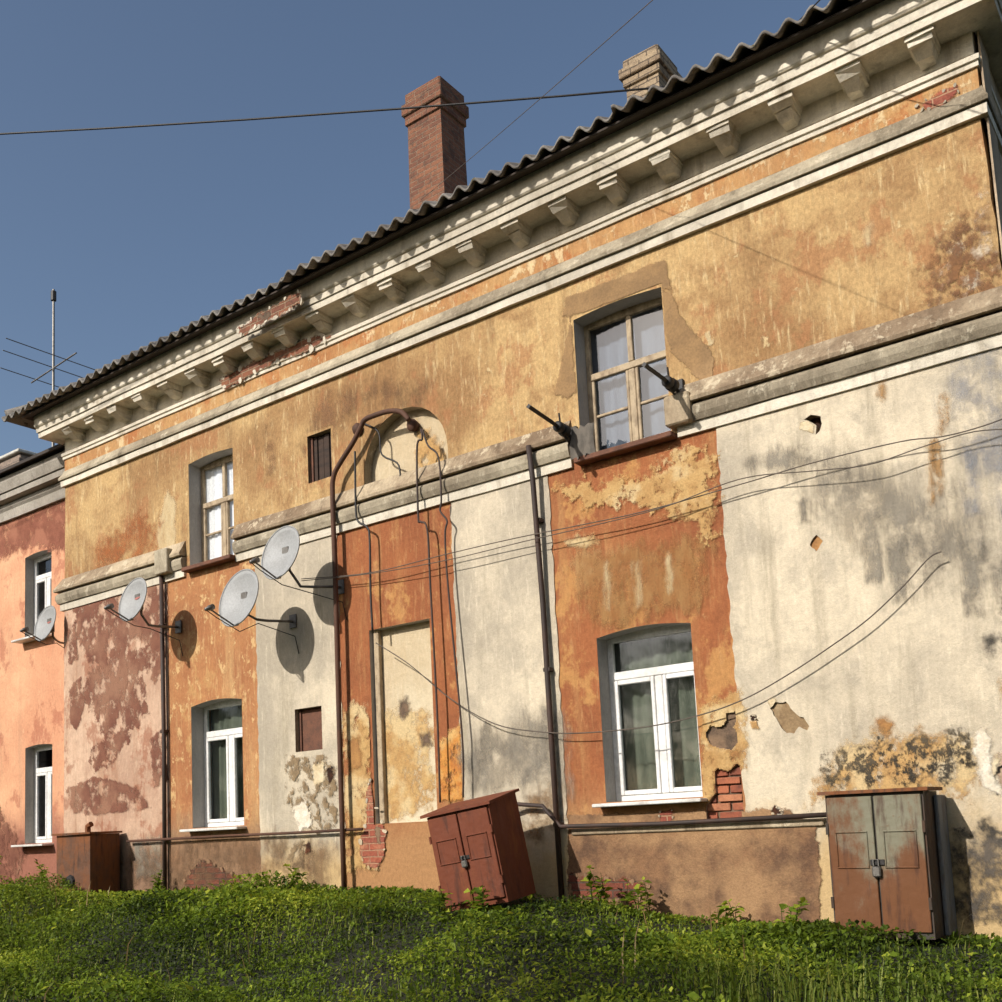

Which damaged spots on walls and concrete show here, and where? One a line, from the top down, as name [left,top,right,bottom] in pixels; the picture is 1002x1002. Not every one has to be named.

leakage [923,207,1001,306]
flaking render [237,289,303,337]
peeling [551,443,723,548]
leakage [748,447,811,470]
spalling [799,415,822,434]
leakage [817,462,1002,614]
leakage [965,406,1002,471]
peeling [66,586,169,816]
peeling [284,699,462,872]
peeling [699,691,759,819]
spalling [768,698,809,734]
peeling [811,718,1002,805]